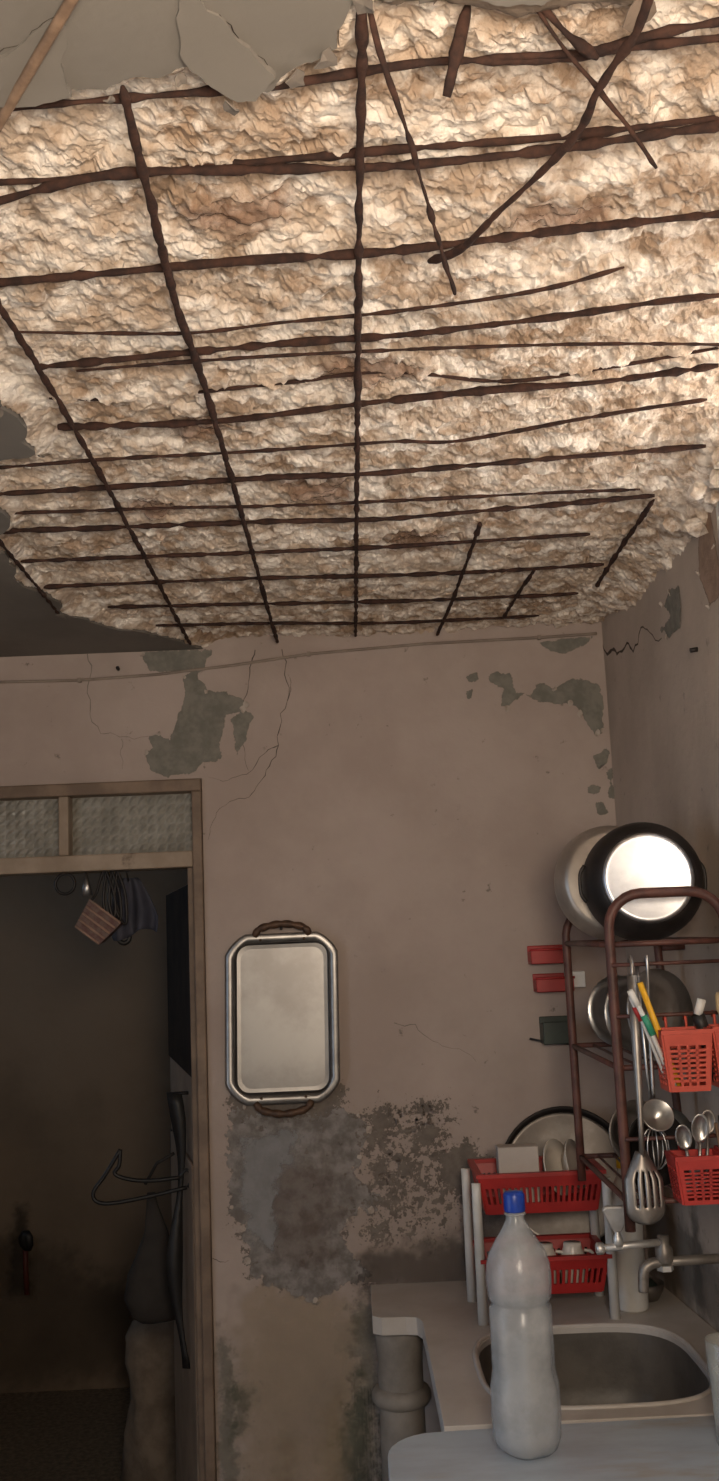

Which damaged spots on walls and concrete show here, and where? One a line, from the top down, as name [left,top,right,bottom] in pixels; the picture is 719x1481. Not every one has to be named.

corrosion [183,191,281,235]
corrosion [513,203,603,227]
corrosion [325,359,418,383]
peeling [0,0,719,778]
corrosion [292,479,349,502]
corrosion [396,530,440,549]
crack [603,626,662,656]
peeling [466,671,615,815]